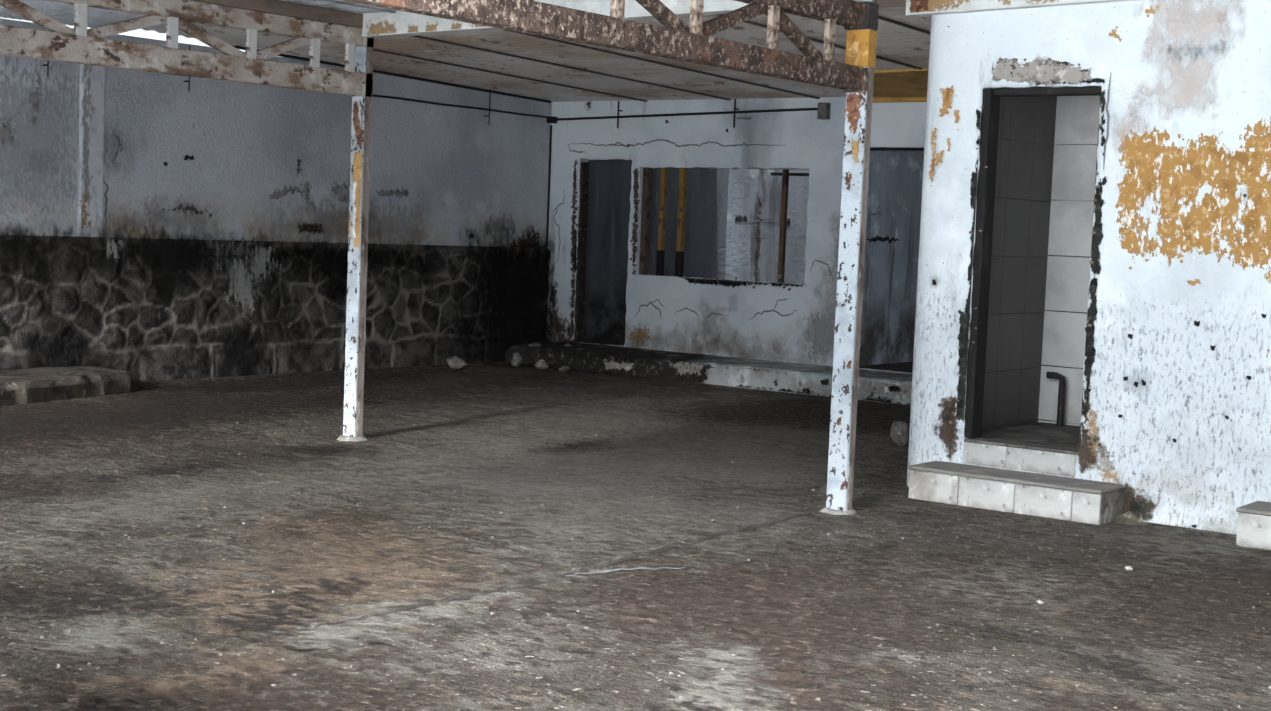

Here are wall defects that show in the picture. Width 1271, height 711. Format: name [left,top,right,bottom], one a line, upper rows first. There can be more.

corrosion [367,21,489,36]
flaking render [1137,0,1230,107]
leakage [0,65,348,313]
peeling [353,101,363,149]
crack [568,116,784,153]
corrosion [845,92,862,185]
peeling [929,86,960,182]
peeling [992,58,1271,283]
crack [635,298,797,320]
leakage [956,106,988,421]
leakage [1102,465,1157,521]
crack [296,513,811,631]